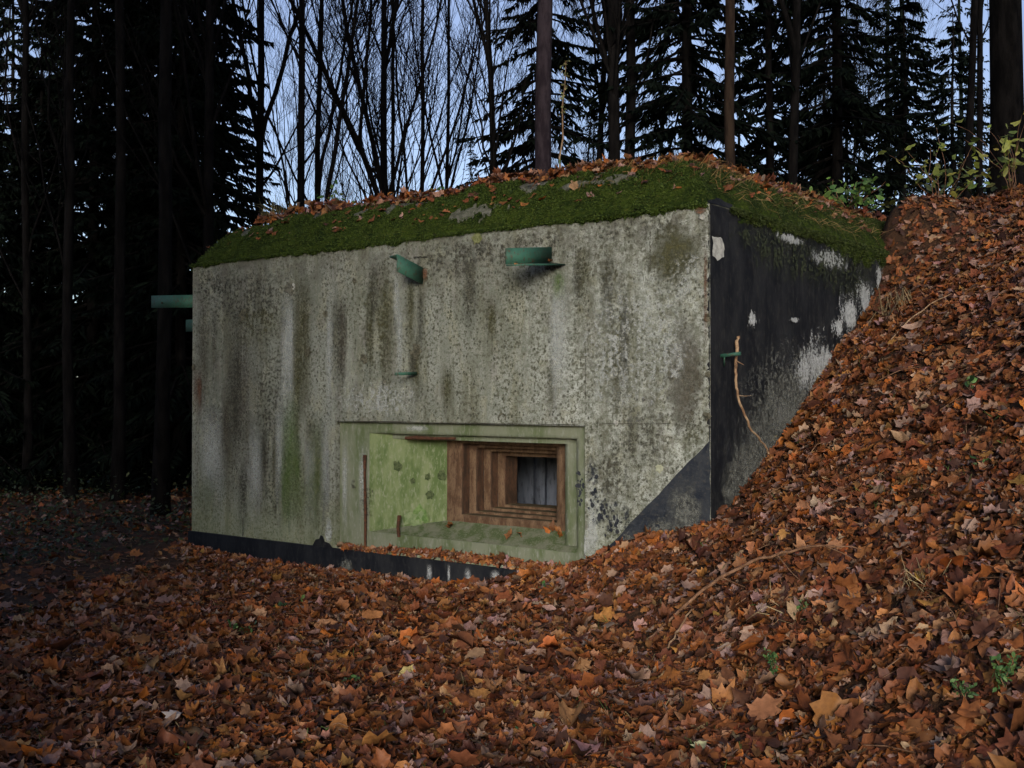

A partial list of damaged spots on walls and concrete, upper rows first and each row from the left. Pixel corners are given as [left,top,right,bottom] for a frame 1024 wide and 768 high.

damp [198,271,328,510]
damp [328,306,346,373]
damp [366,269,423,367]
damp [429,233,564,309]
damp [584,261,703,439]
damp [607,219,699,292]